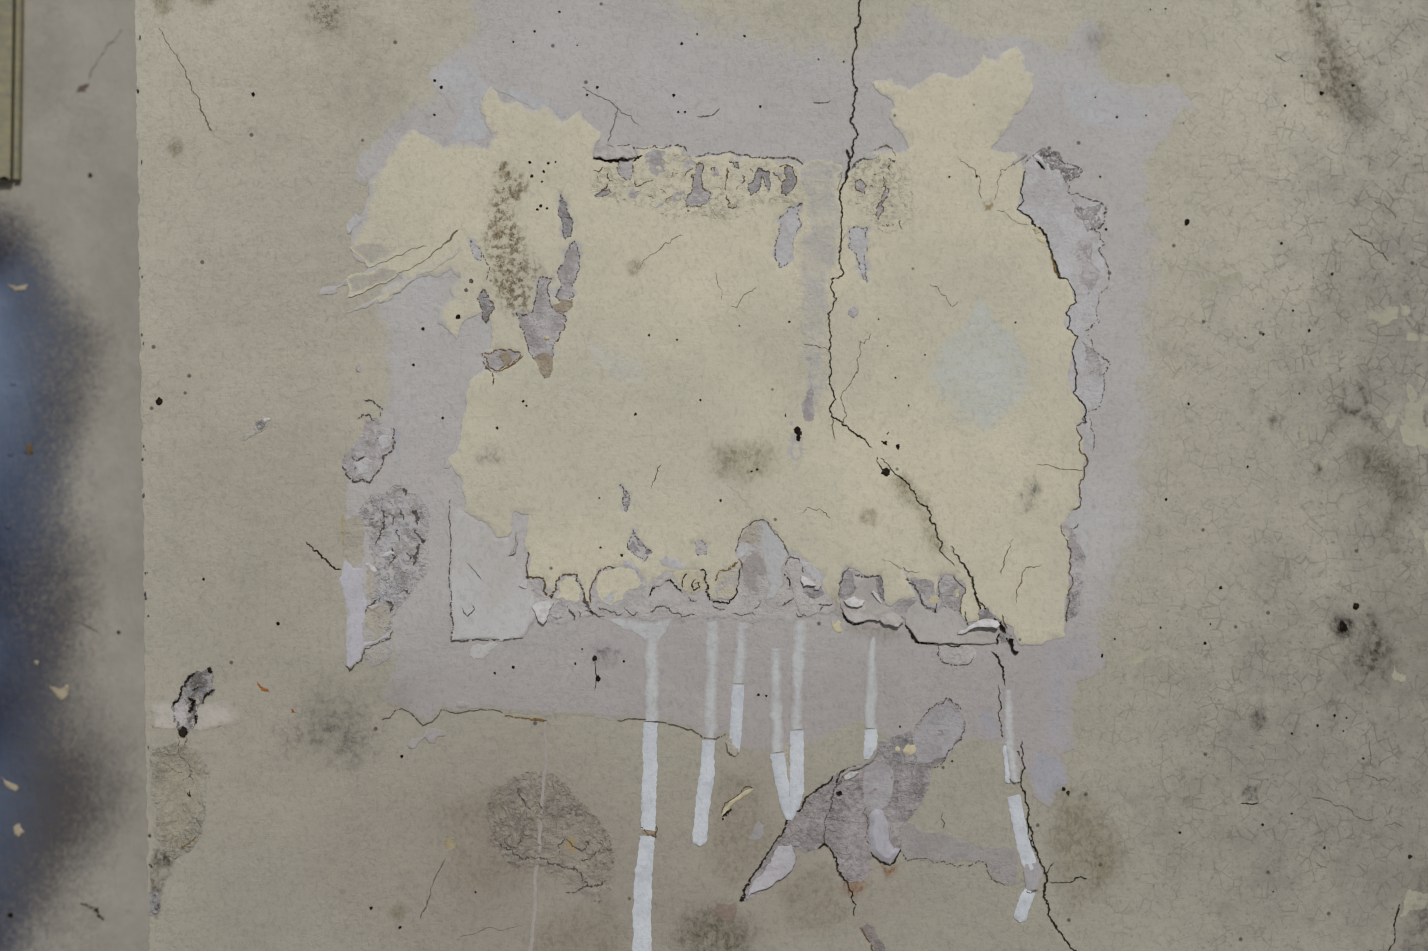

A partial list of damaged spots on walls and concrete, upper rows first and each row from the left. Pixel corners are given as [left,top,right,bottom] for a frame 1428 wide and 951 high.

peeling [1184,199,1217,225]
peeling [342,194,1063,951]
peeling [354,0,1203,658]
crack [804,0,1089,951]
peeling [1368,303,1428,342]
peeling [1384,383,1428,448]
peeling [147,667,215,868]